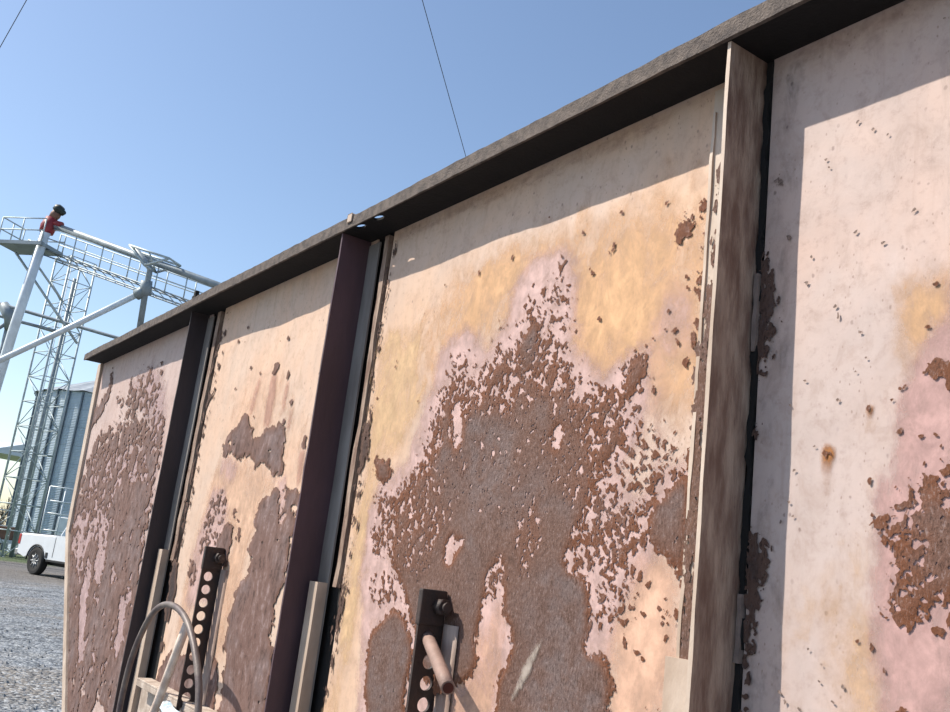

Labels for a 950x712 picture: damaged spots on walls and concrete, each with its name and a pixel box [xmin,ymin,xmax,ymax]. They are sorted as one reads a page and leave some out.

peeling [71,371,164,682]
peeling [188,491,227,605]
rust [323,162,721,712]
peeling [358,250,688,712]
rust [740,526,772,712]
rust [755,251,782,381]
rust [813,445,834,464]
peeling [870,323,950,712]